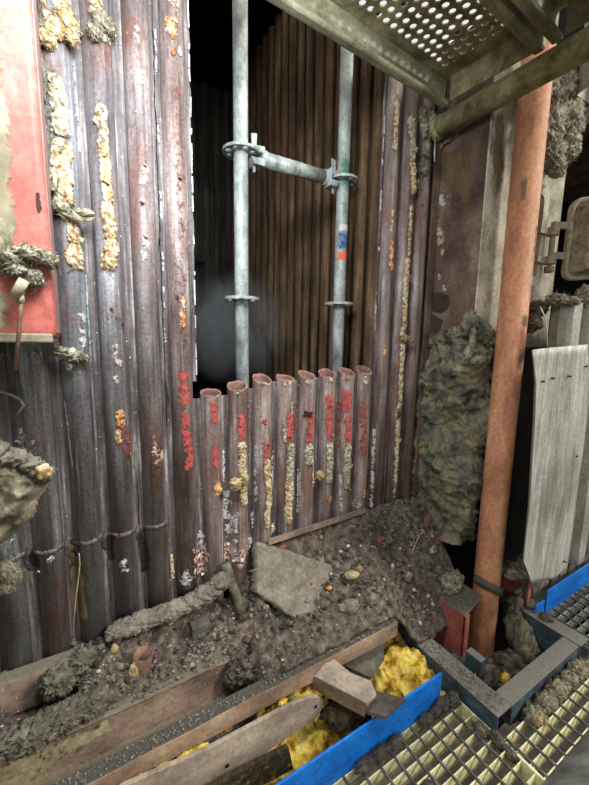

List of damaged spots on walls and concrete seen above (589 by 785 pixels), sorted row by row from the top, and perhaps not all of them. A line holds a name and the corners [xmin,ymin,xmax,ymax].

corrosion [164,0,183,56]
corrosion [392,99,400,151]
corrosion [114,410,132,459]